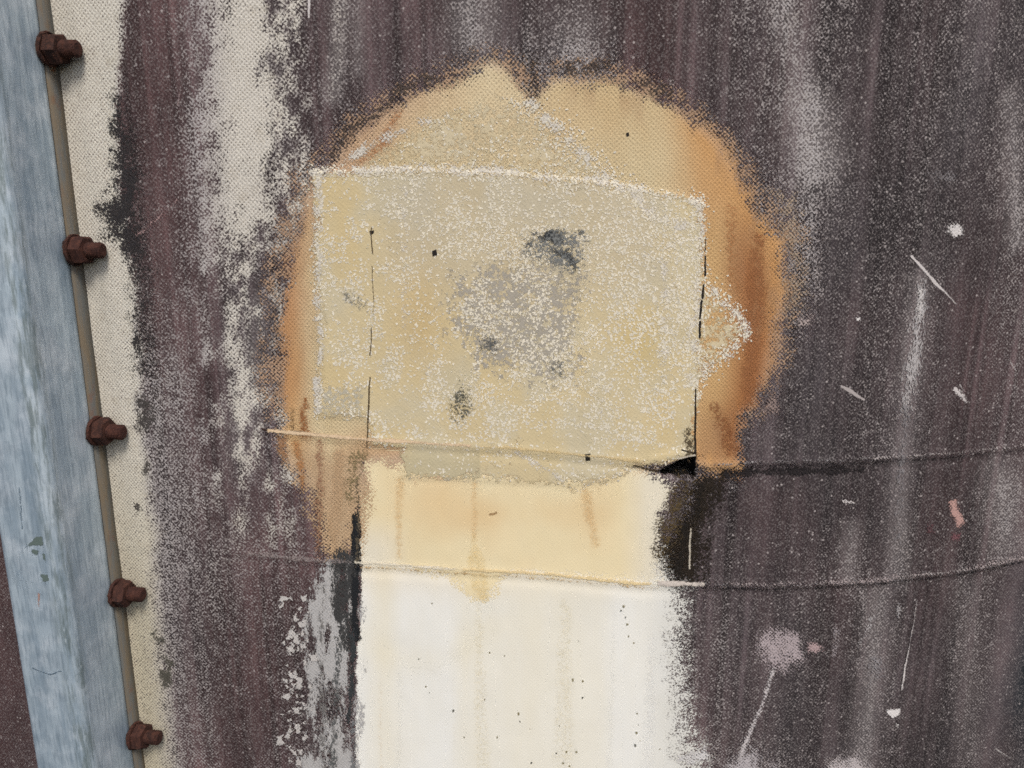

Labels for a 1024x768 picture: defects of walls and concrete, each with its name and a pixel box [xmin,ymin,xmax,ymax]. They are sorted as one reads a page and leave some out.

crack [366,227,374,442]
mould [450,380,473,423]
peeling [304,92,753,492]
rust [251,42,811,564]
damp [521,228,587,276]
crack [698,239,706,338]
peeling [276,594,318,766]
damp [295,448,730,768]